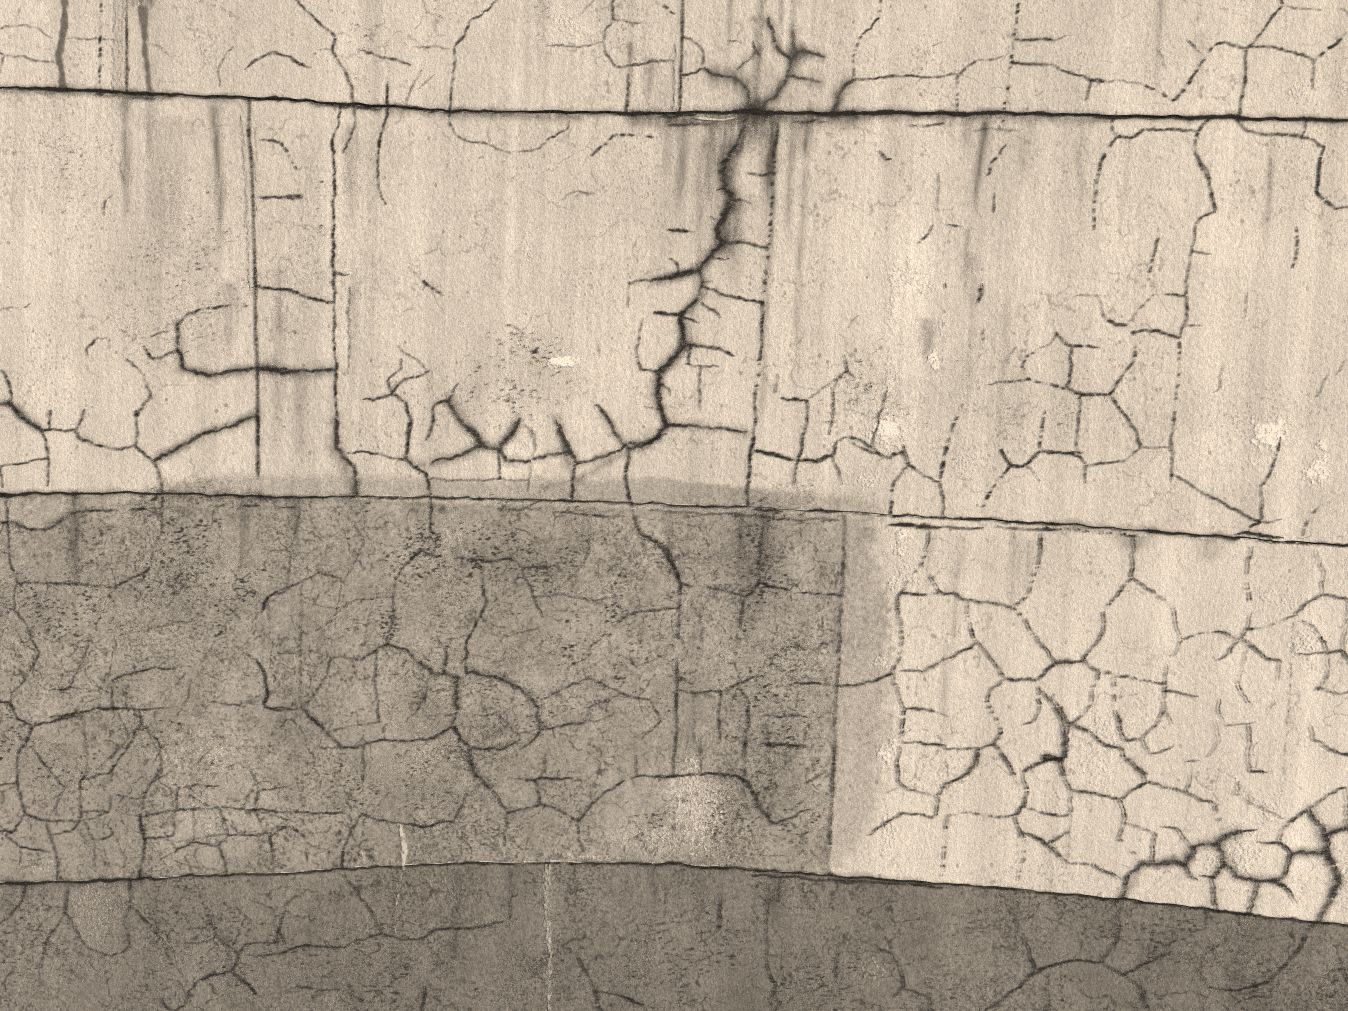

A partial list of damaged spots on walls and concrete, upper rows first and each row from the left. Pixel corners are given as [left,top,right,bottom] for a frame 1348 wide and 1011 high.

crack [0,0,1348,639]
crack [247,548,811,851]
crack [795,411,1348,991]
crack [0,568,515,968]
crack [532,846,1026,891]
crack [163,904,347,1011]
crack [578,957,645,1011]
crack [766,889,778,1011]
crack [880,949,932,1011]
crack [985,912,1172,1011]